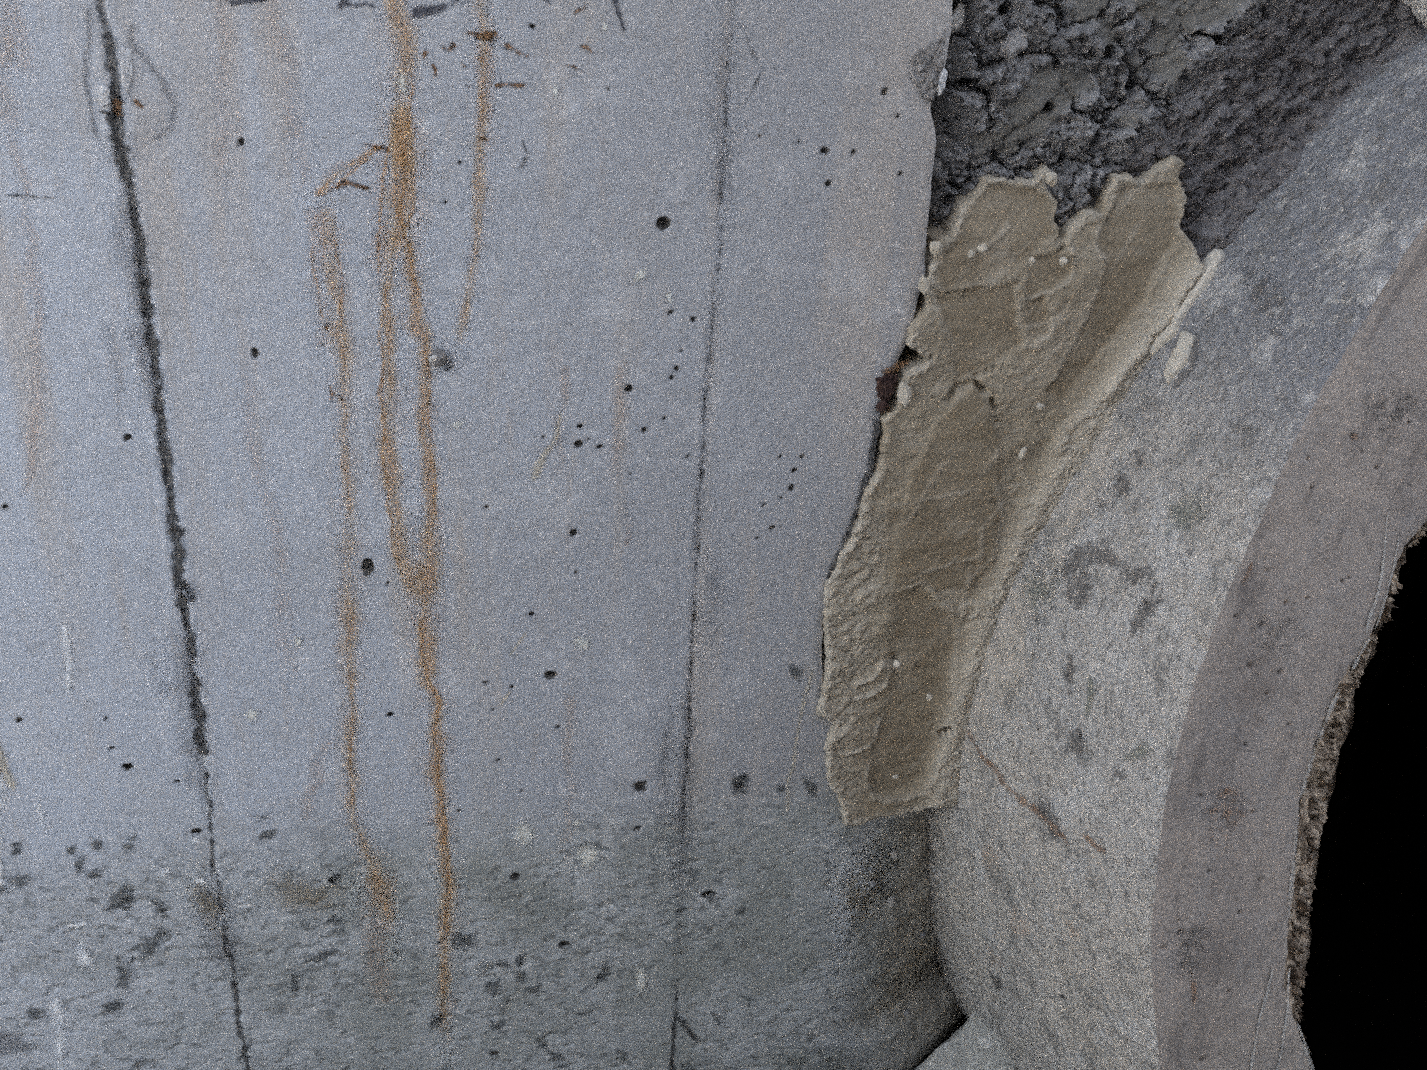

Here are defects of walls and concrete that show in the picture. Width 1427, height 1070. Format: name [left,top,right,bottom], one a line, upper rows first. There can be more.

crack [724,4,760,125]
corrosion [335,180,370,190]
spalling [928,0,1427,385]
spalling [875,360,912,413]
crack [97,0,250,1070]
crack [682,602,696,832]
leakage [79,946,91,965]
leakage [52,999,64,1070]
crack [670,991,699,1070]